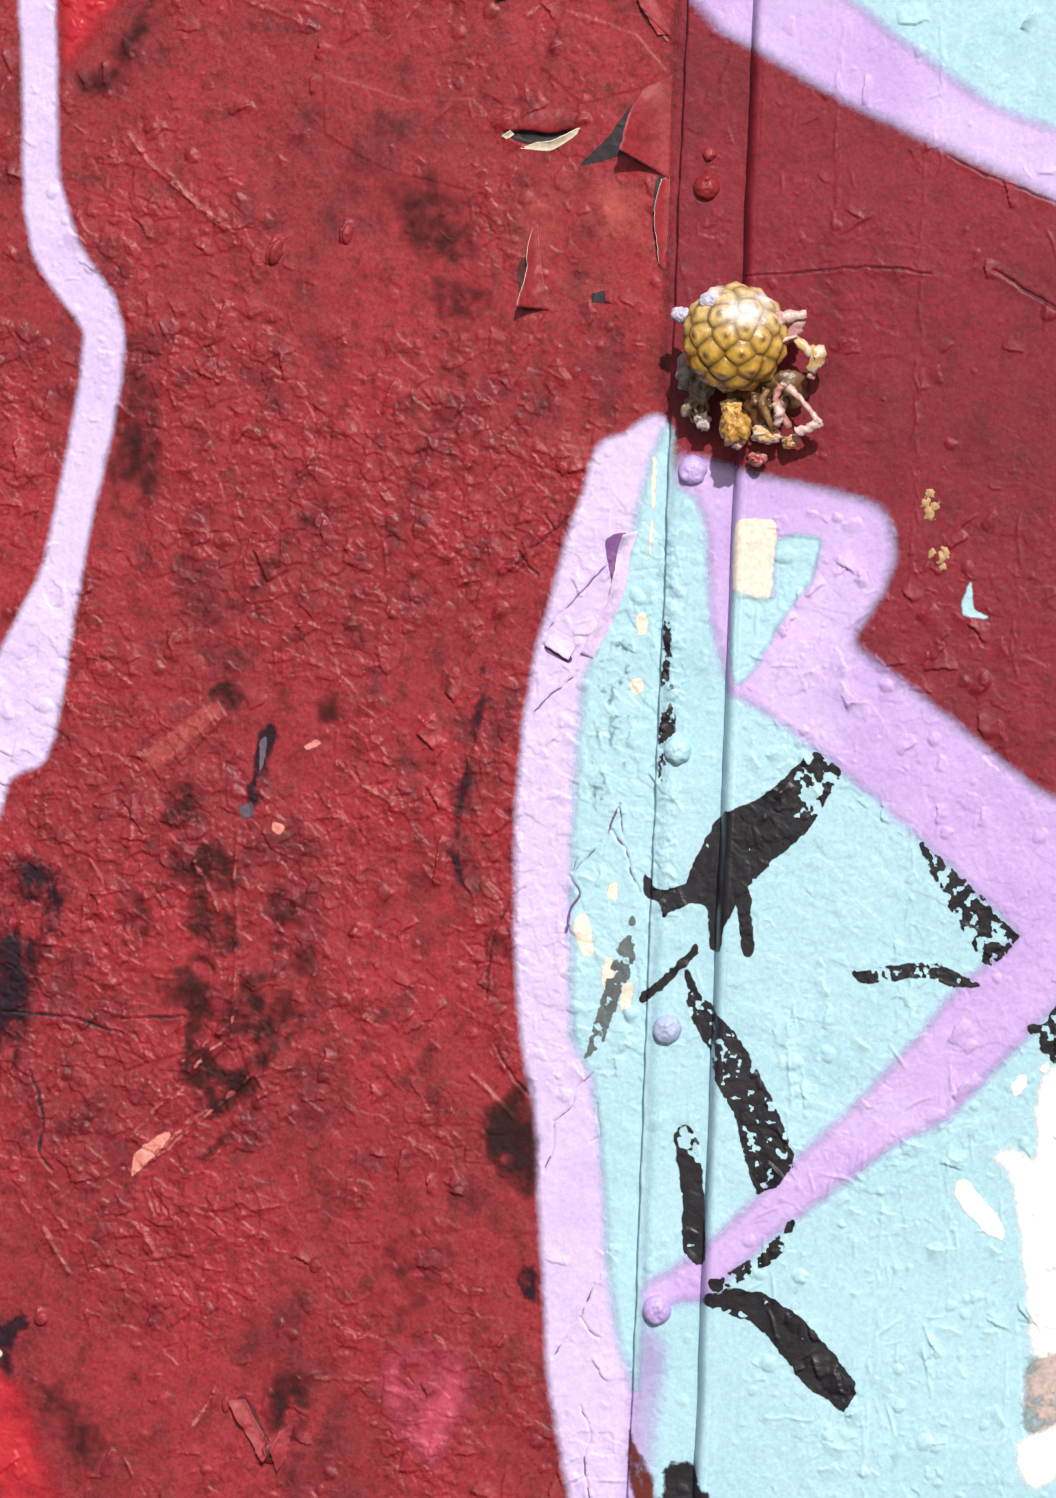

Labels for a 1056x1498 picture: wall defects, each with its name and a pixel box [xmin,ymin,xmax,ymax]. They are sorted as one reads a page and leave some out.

peeling [638,0,670,42]
peeling [502,128,580,151]
peeling [580,74,673,270]
peeling [517,225,550,311]
peeling [544,456,657,663]
peeling [729,518,821,684]
peeling [962,582,988,619]
peeling [629,678,644,695]
peeling [573,913,634,1011]
peeling [954,1062,1056,1359]
peeling [227,1396,294,1472]
peeling [1017,1423,1056,1489]